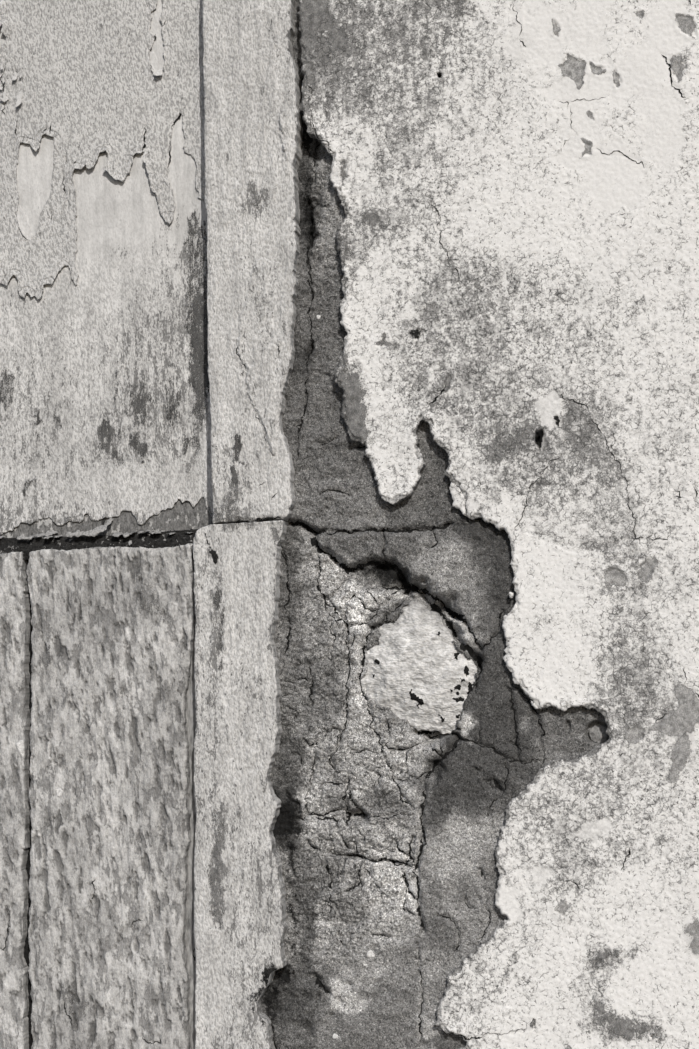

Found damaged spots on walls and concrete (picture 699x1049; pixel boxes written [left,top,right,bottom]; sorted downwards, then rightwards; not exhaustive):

peeling [149,0,171,78]
spalling [288,0,304,95]
spalling [558,53,620,90]
spalling [670,55,687,82]
spalling [675,13,696,39]
peeling [13,121,60,240]
peeling [67,114,197,228]
peeling [0,260,73,319]
leakage [97,210,209,464]
peeling [236,335,276,456]
spalling [261,111,609,1049]
crack [237,484,545,1040]